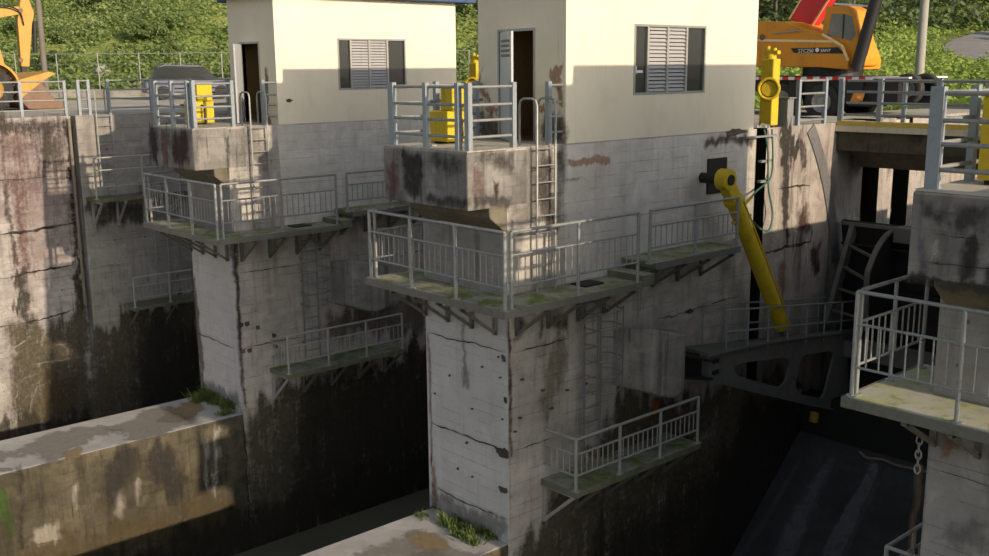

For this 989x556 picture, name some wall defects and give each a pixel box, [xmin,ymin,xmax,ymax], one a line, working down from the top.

peeling [549,65,563,106]
spalling [569,155,610,166]
leakage [779,120,807,245]
leakage [906,208,989,296]
leakage [0,180,201,505]
crack [428,332,568,353]
leakage [0,295,429,556]
crack [433,423,548,451]
leakage [520,365,802,556]